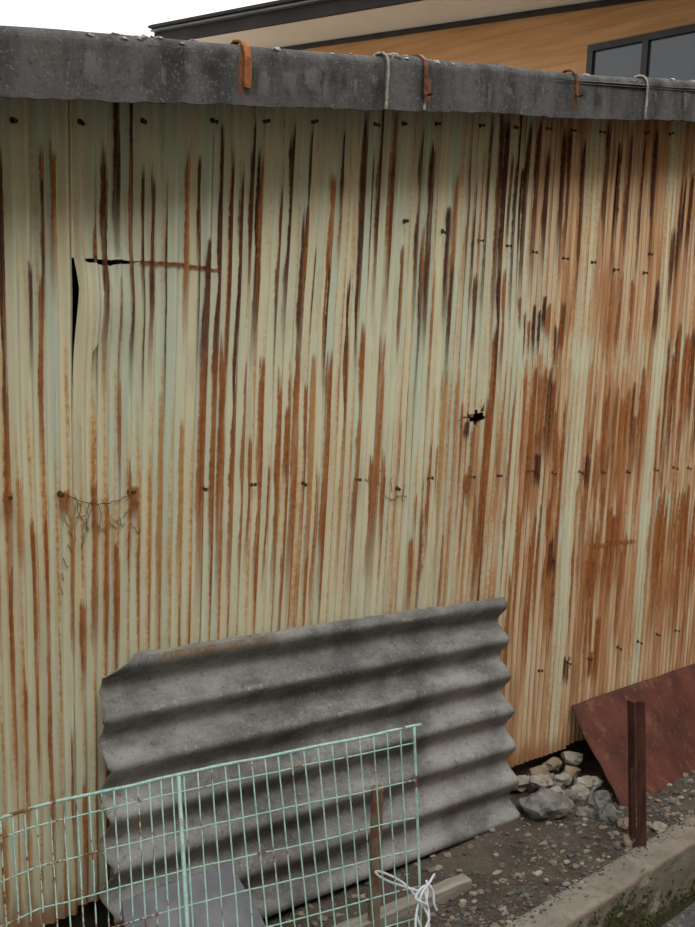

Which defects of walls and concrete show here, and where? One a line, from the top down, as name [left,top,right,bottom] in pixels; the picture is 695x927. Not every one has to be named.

rust [0,143,57,879]
rust [60,103,587,674]
rust [568,368,648,673]
rust [607,273,636,347]
rust [601,126,659,250]
rust [643,326,695,628]
rust [653,175,694,333]
rust [71,738,89,869]